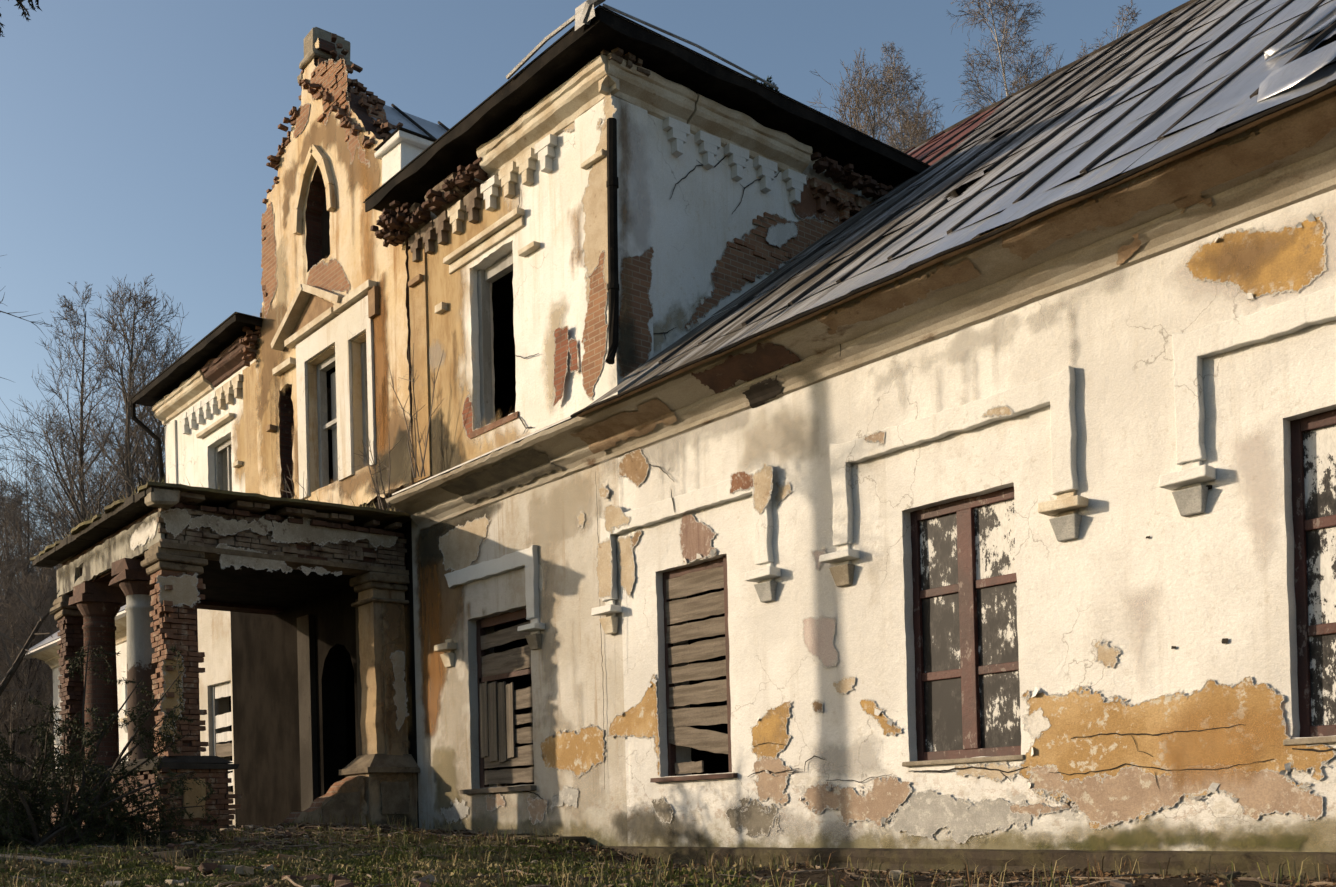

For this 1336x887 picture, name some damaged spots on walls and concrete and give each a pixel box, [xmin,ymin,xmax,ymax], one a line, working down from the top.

flaking render [293,58,370,168]
crack [670,155,781,214]
flaking render [553,88,654,407]
flaking render [684,176,852,331]
flaking render [1183,211,1328,302]
flaking render [679,514,717,564]
flaking render [802,615,902,737]
flaking render [1093,637,1121,669]
flaking render [527,673,661,825]
flaking render [725,676,1336,844]
crack [748,724,1336,788]